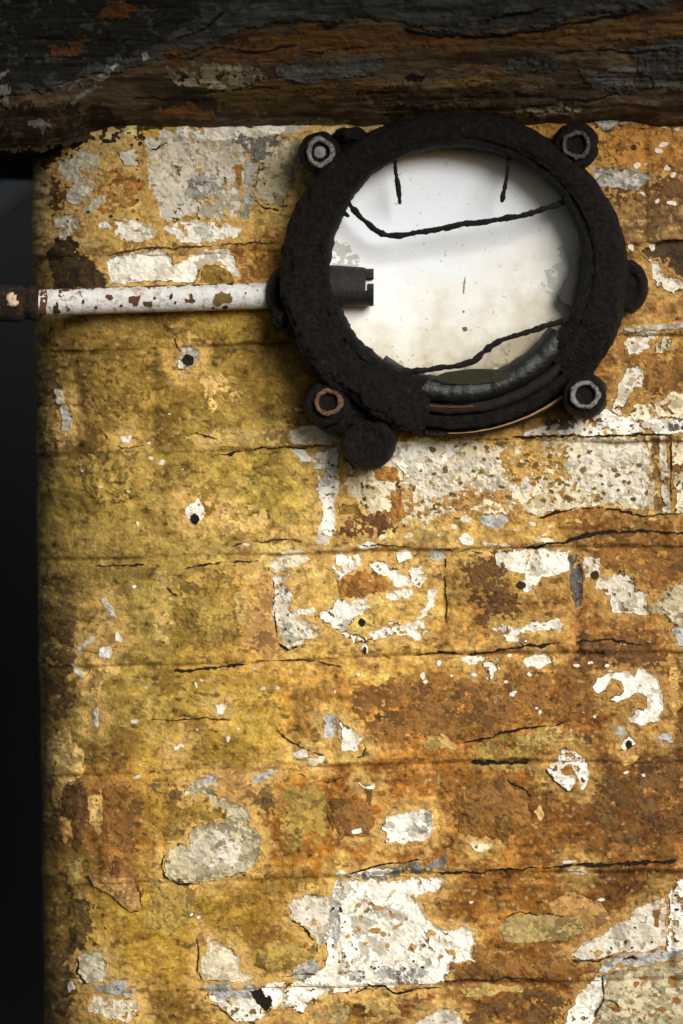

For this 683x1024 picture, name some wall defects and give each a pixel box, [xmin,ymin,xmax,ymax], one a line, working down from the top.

spalling [49,118,349,304]
crack [173,538,342,673]
spalling [182,322,683,774]
crack [512,432,683,549]
rust [351,620,668,746]
rust [98,784,146,897]
spalling [156,767,271,890]
crack [349,858,677,875]
crack [464,720,567,798]
rust [560,763,575,776]
spalling [190,854,523,1024]
spalling [498,878,683,1024]